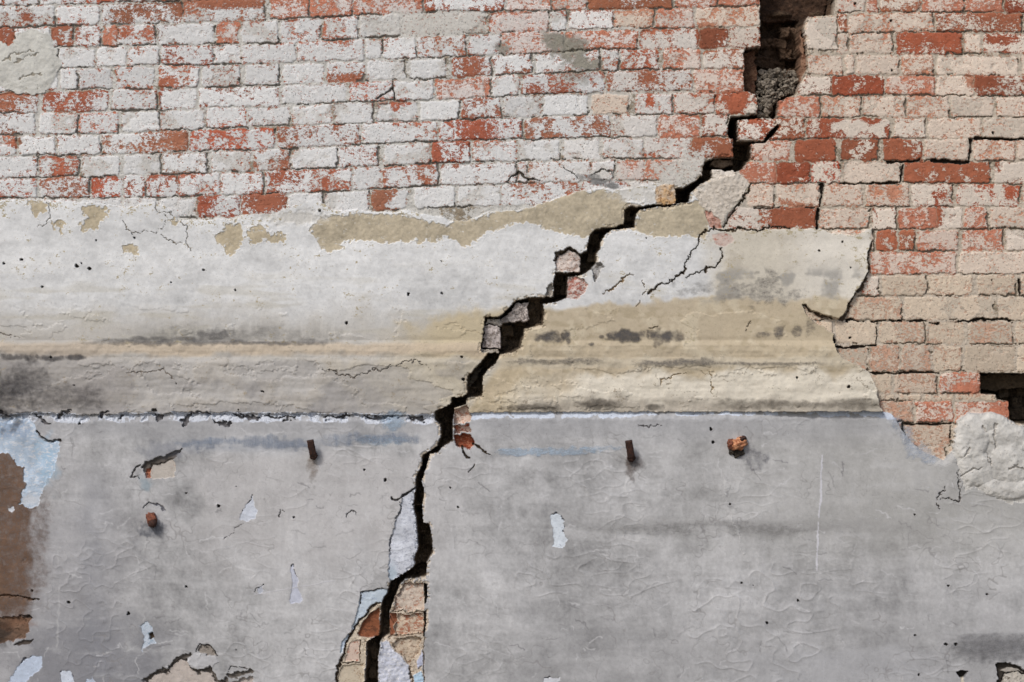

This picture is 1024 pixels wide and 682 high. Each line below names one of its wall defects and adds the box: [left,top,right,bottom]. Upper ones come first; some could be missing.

peeling [307,189,712,255]
peeling [766,227,876,328]
spalling [0,410,434,512]
crack [324,360,421,379]
peeling [472,411,657,421]
crack [366,0,836,682]
peeling [807,411,934,459]
spalling [979,373,1024,425]
flaking render [336,485,429,682]